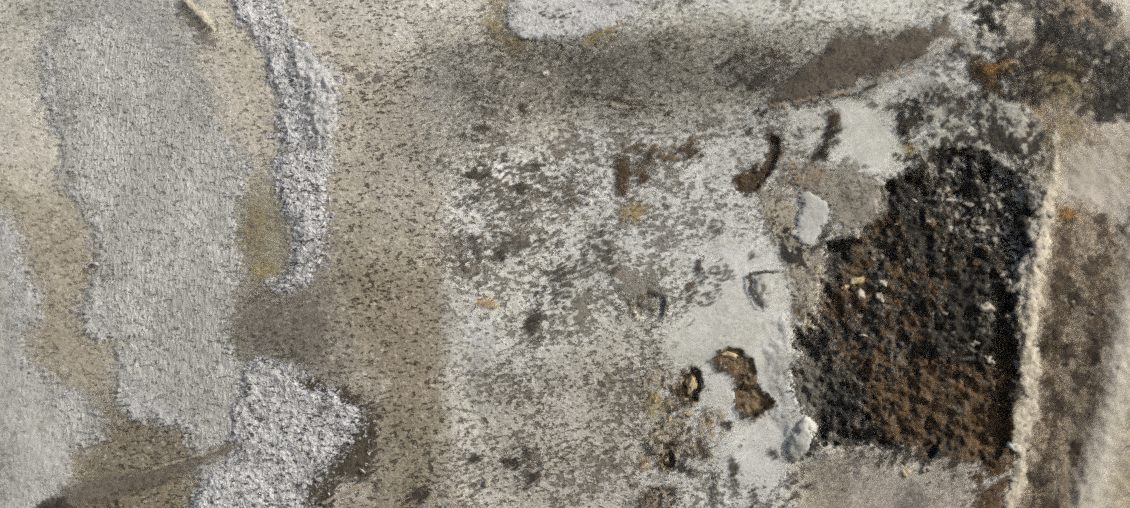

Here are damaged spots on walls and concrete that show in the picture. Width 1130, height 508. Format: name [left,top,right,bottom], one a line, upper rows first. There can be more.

spalling [436,35,1058,508]
mould [964,0,1130,181]